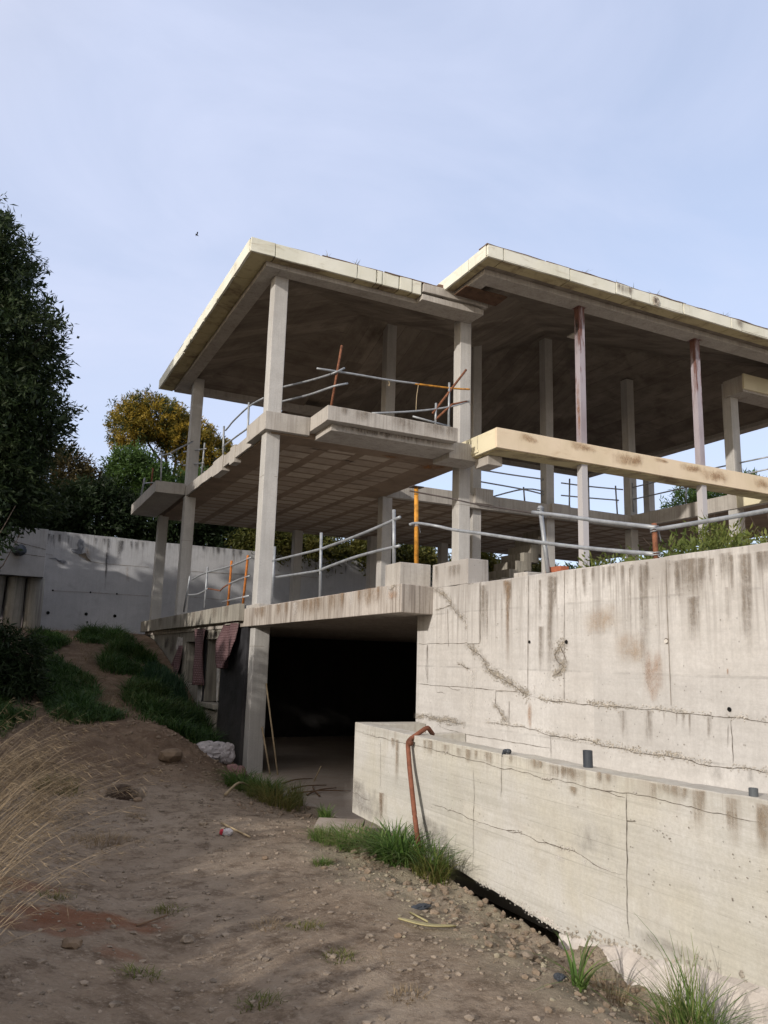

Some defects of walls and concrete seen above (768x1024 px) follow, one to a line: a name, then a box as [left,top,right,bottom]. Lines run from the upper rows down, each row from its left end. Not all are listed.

water stain [676,558,704,583]
water stain [724,551,766,613]
crack [356,588,755,930]
water stain [758,805,768,840]